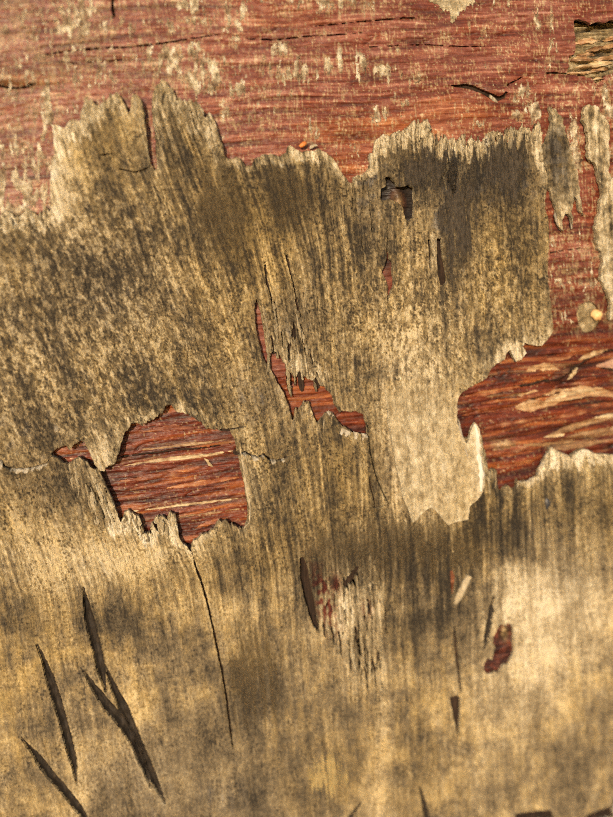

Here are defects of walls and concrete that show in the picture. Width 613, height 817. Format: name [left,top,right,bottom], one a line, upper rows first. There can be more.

peeling [0,0,613,526]
peeling [52,404,247,564]
crack [189,546,233,746]
crack [300,557,316,626]
crack [343,566,359,586]
crack [450,626,460,731]
peeling [483,596,512,673]